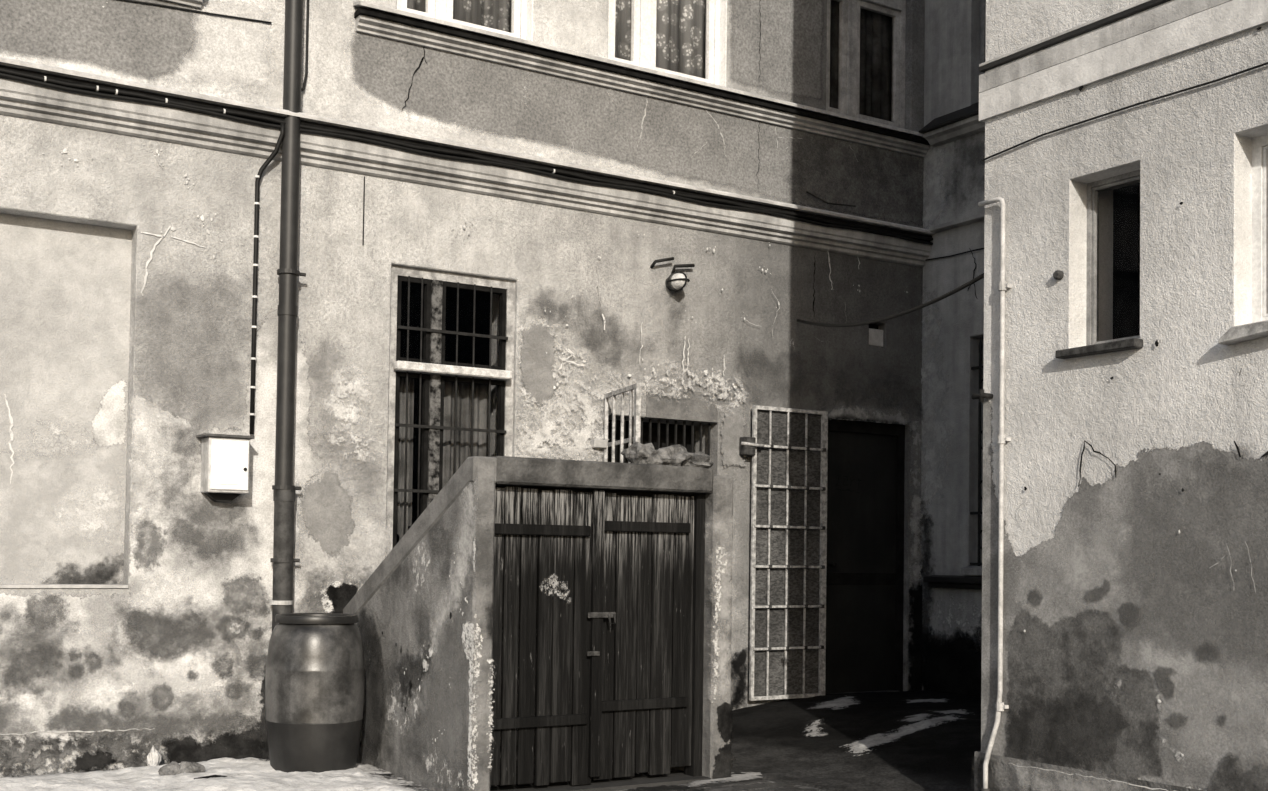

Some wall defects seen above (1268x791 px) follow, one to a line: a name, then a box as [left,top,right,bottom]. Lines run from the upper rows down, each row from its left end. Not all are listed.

crack [402,47,427,110]
leakage [71,749,117,772]
flaking render [0,310,278,778]
flaking render [293,327,390,613]
flaking render [404,645,433,692]
flaking render [449,553,495,790]
leakage [538,299,581,318]
leakage [517,313,826,461]
leakage [712,521,749,708]
leakage [835,293,982,697]
leakage [973,458,1268,791]
peeling [981,398,1268,791]